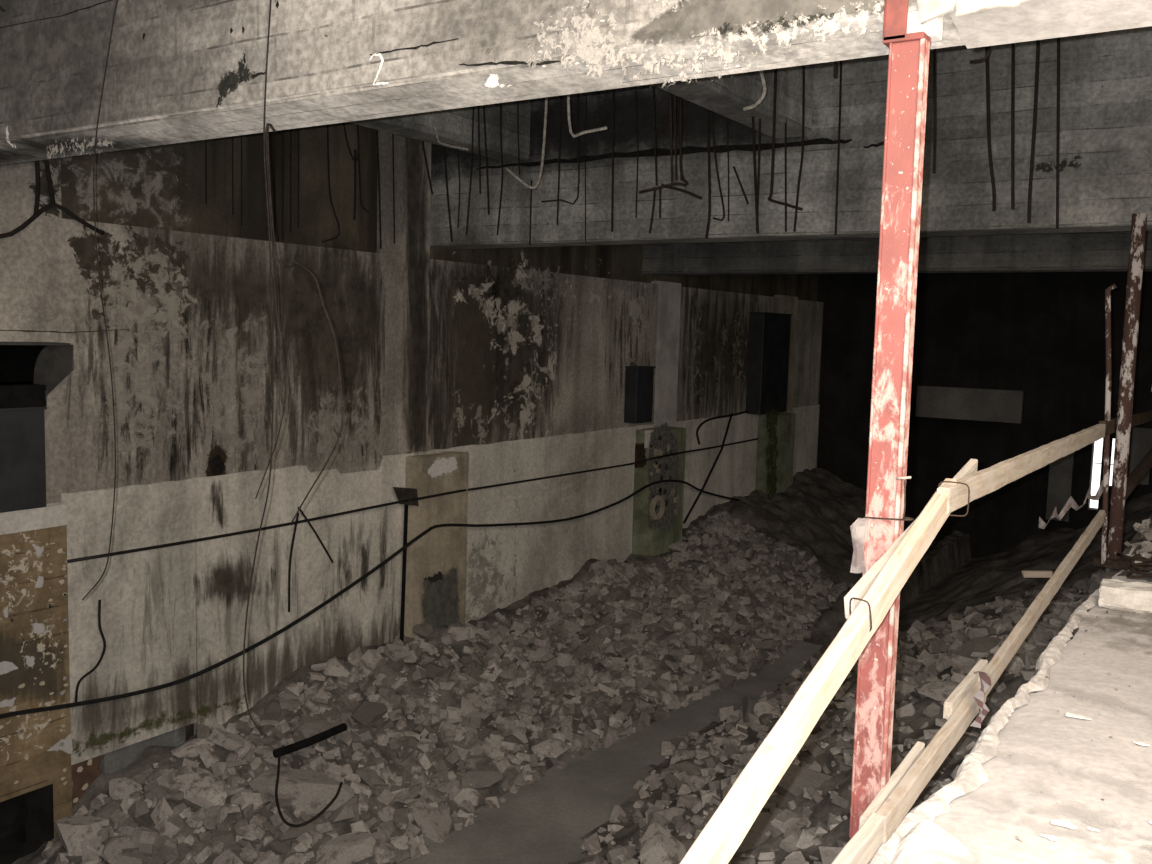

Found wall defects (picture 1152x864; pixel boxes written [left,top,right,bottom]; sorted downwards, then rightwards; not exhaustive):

water stain [522,0,800,162]
spalling [633,0,885,57]
flaking render [956,0,1026,16]
water stain [68,226,385,482]
water stain [405,138,562,453]
water stain [681,278,767,419]
peeling [0,530,102,808]
water stain [82,540,400,737]
water stain [338,517,392,598]